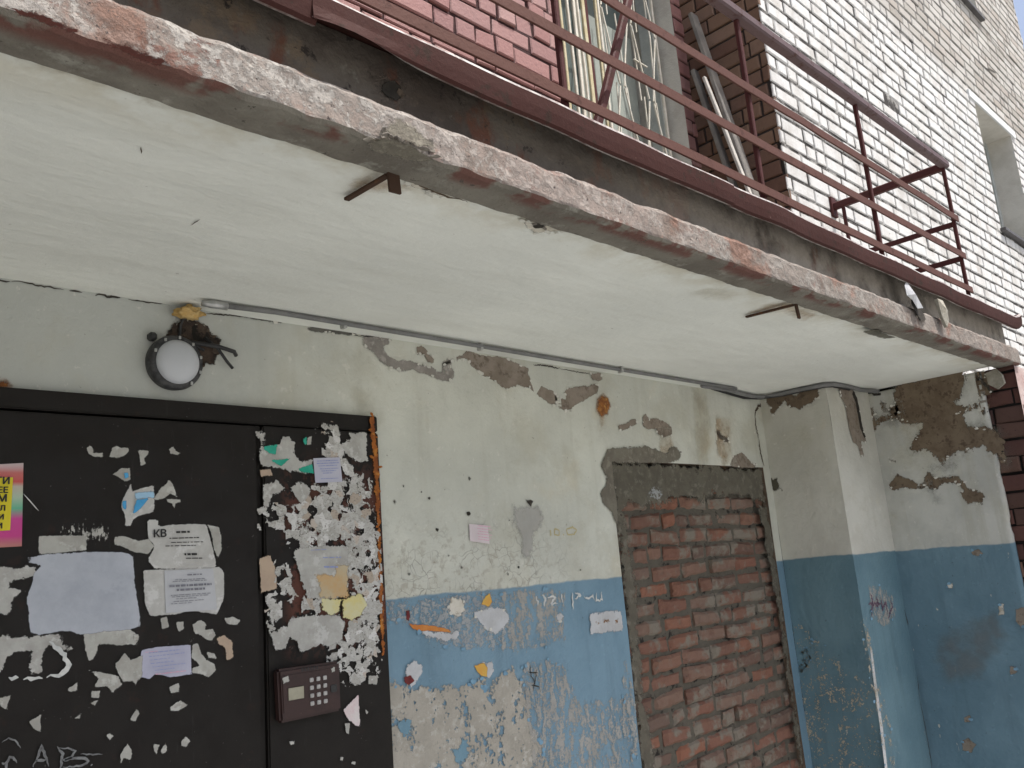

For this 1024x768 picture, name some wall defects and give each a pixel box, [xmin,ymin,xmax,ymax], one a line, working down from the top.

flaking render [308,327,603,413]
corrosion [597,395,611,417]
flaking render [764,389,821,416]
flaking render [619,414,682,453]
flaking render [839,370,1012,505]
flaking render [730,453,758,468]
peeling [386,587,639,768]